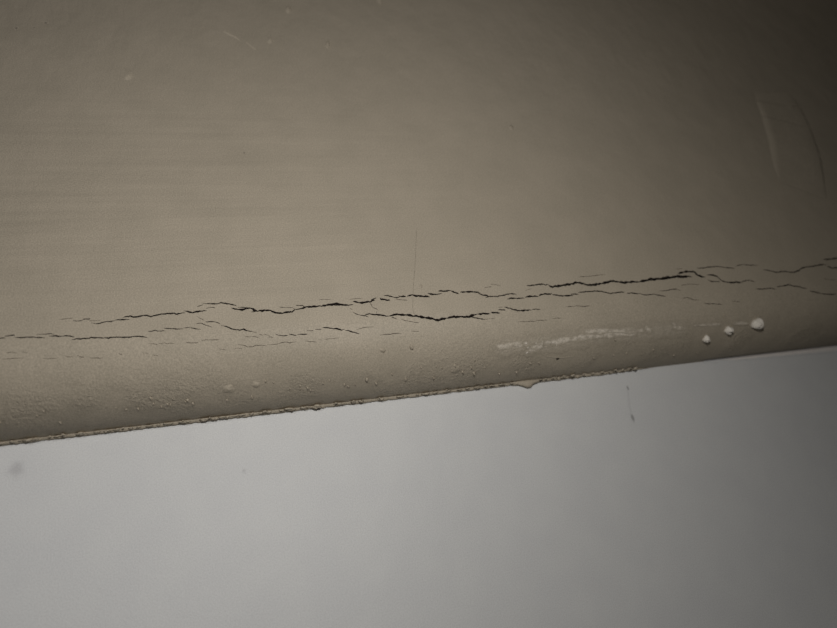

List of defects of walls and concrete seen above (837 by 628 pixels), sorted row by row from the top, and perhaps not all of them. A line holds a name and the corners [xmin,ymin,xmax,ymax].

crack [0,229,837,359]